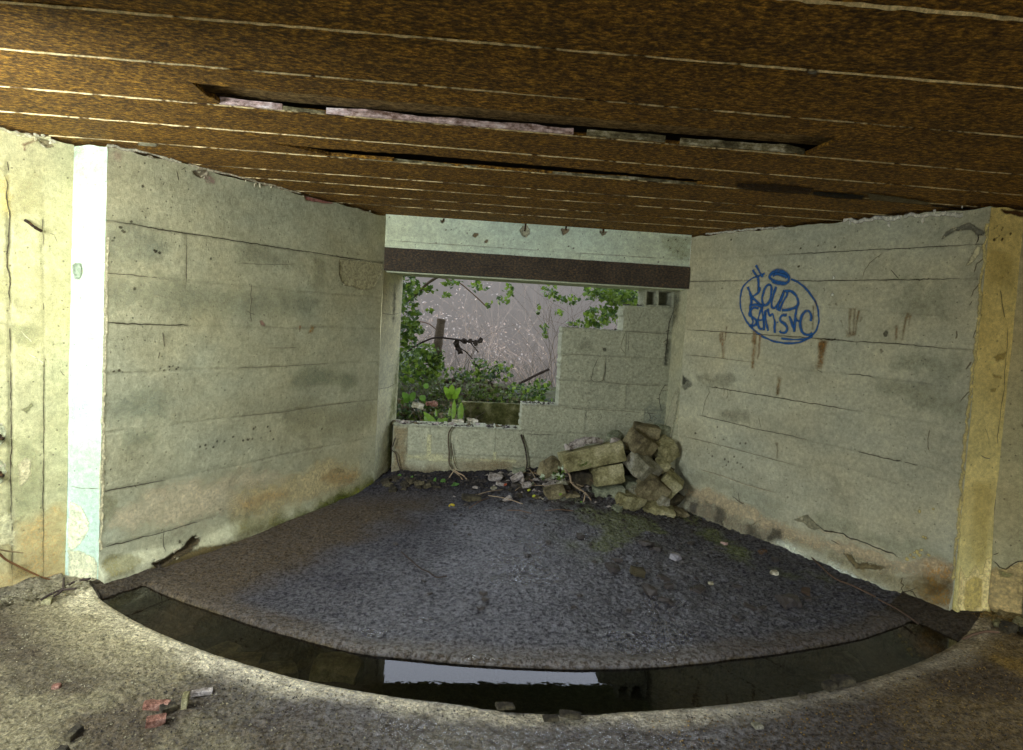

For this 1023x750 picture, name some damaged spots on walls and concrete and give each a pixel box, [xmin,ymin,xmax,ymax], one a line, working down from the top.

peeling [219,97,574,135]
peeling [587,129,666,143]
peeling [680,138,805,154]
spalling [68,221,132,579]
water stain [116,460,359,569]
water stain [686,499,805,558]
crack [818,525,917,598]
water stain [829,558,953,608]